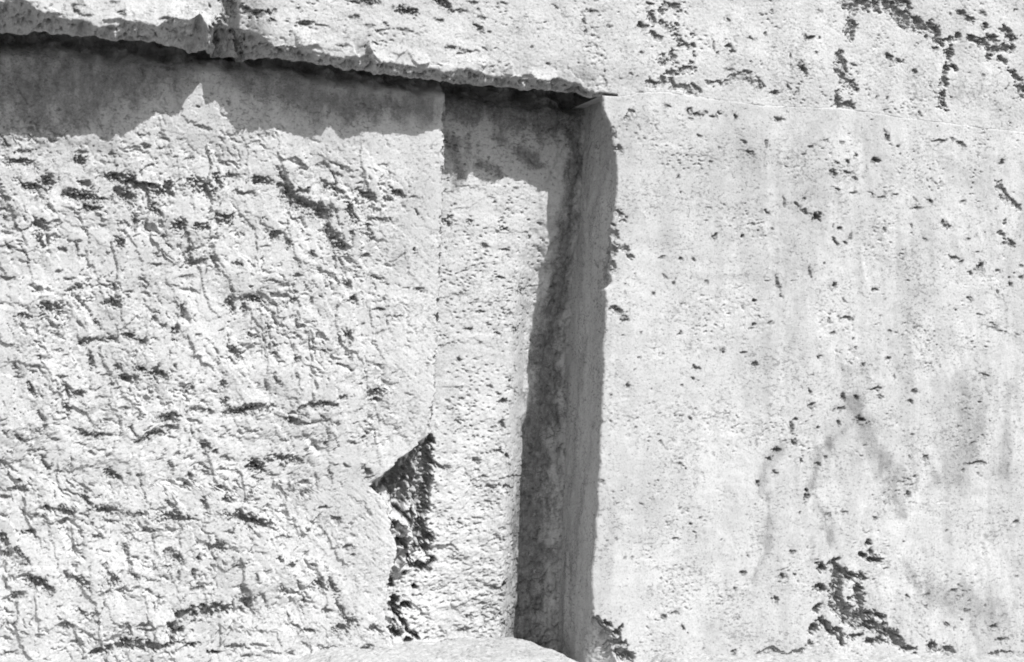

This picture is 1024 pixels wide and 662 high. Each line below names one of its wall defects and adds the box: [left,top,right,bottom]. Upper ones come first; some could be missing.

spalling [371,434,435,571]
spalling [386,579,418,640]